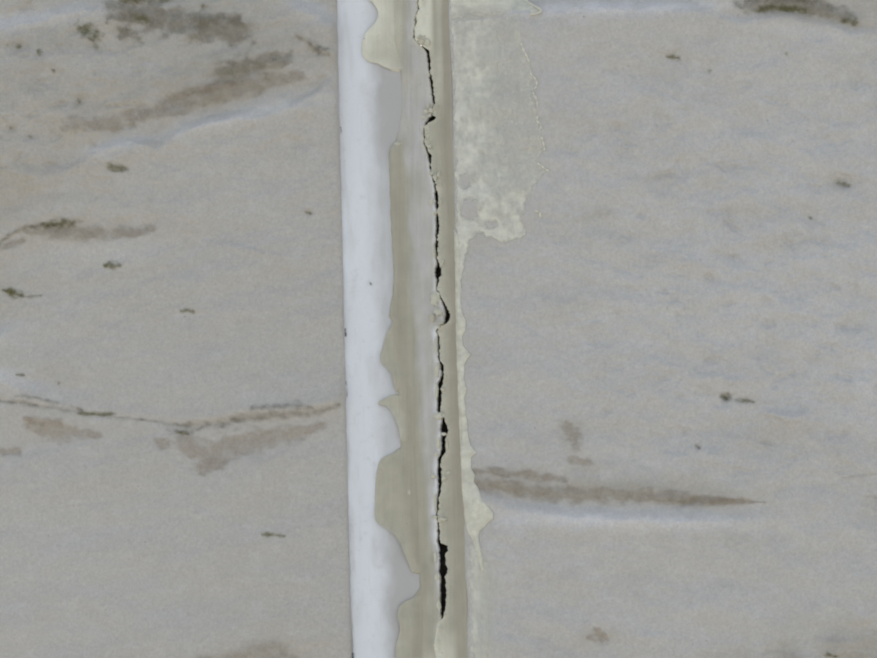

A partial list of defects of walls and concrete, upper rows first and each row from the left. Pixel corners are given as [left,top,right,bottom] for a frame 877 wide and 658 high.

crack [414,20,451,618]